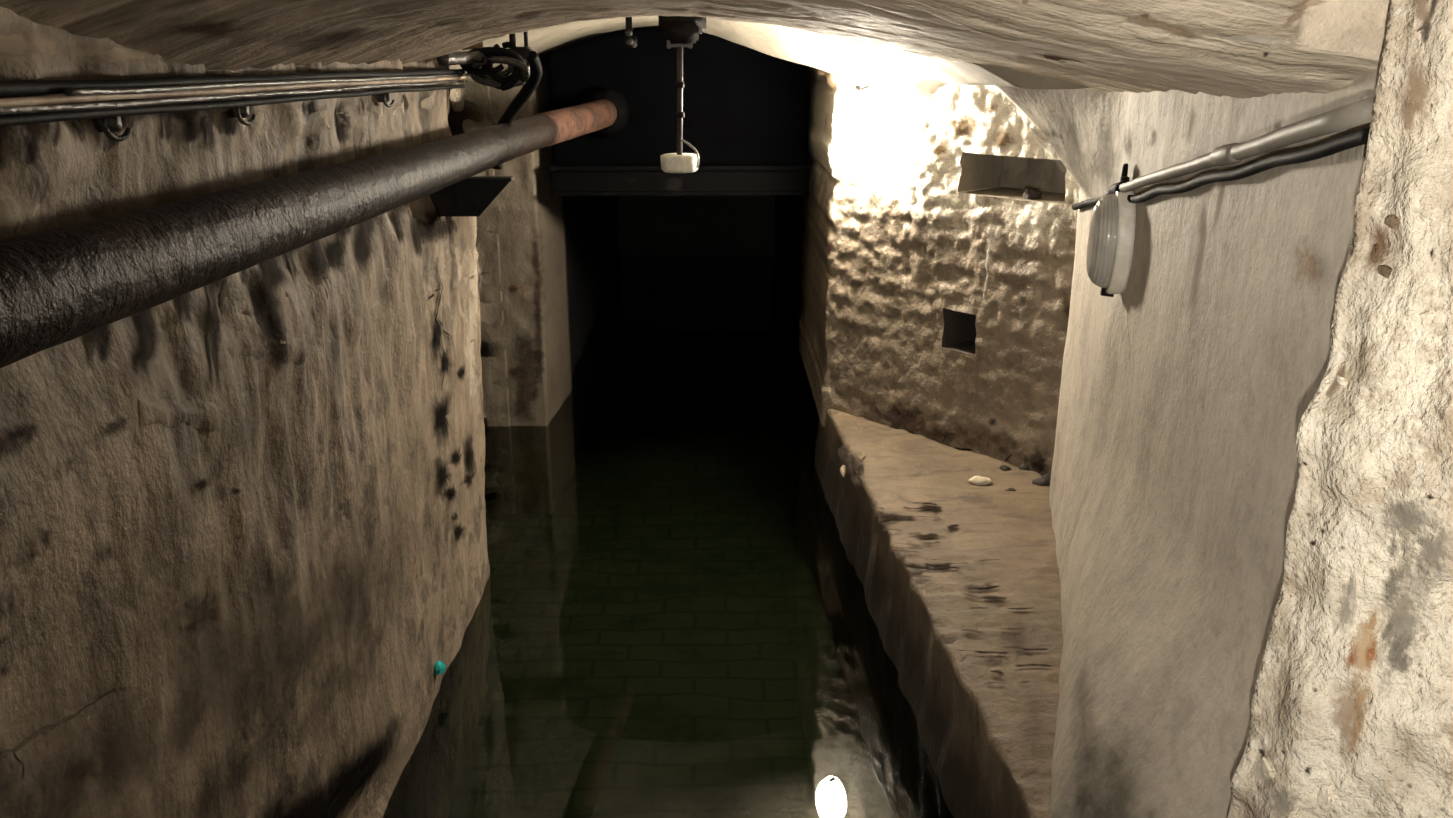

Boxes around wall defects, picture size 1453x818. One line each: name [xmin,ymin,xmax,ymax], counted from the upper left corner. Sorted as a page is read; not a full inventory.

rust [1348,615,1375,749]
crack [0,691,111,778]
water stain [264,719,401,818]